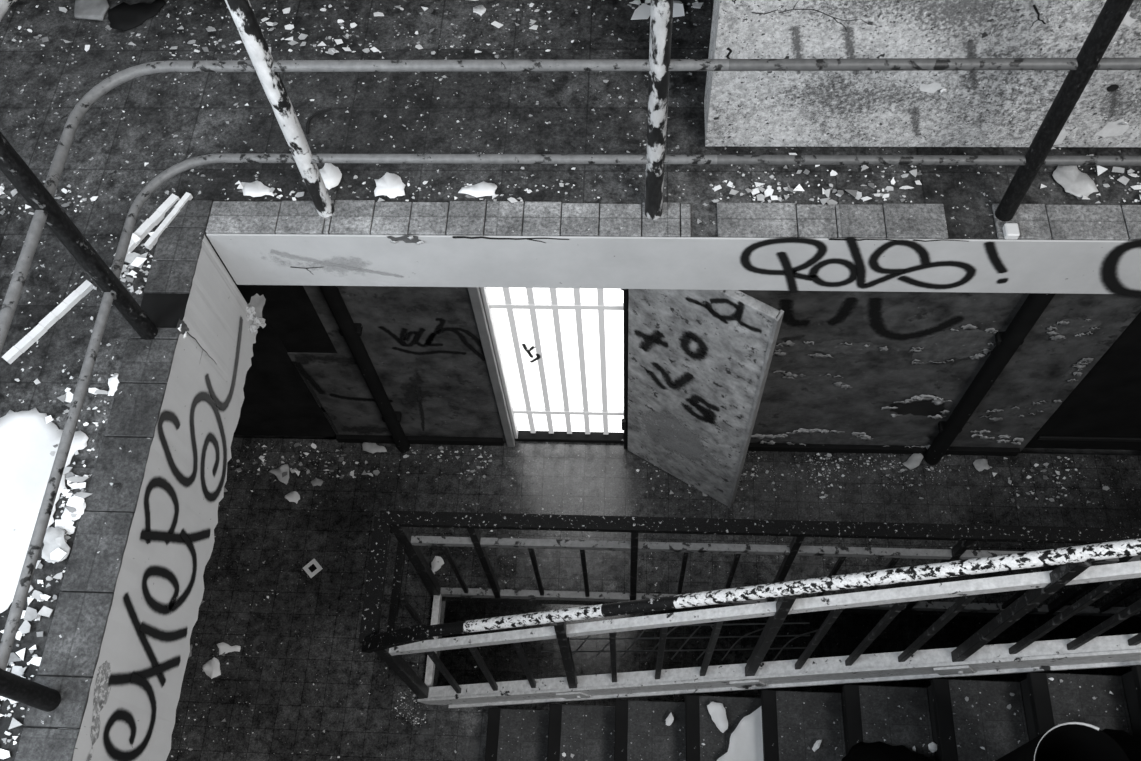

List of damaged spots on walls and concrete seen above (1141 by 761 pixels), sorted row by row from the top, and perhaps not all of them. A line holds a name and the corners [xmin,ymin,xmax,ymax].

peeling [242,181,274,197]
peeling [319,163,342,190]
peeling [881,394,952,420]
peeling [42,502,86,563]